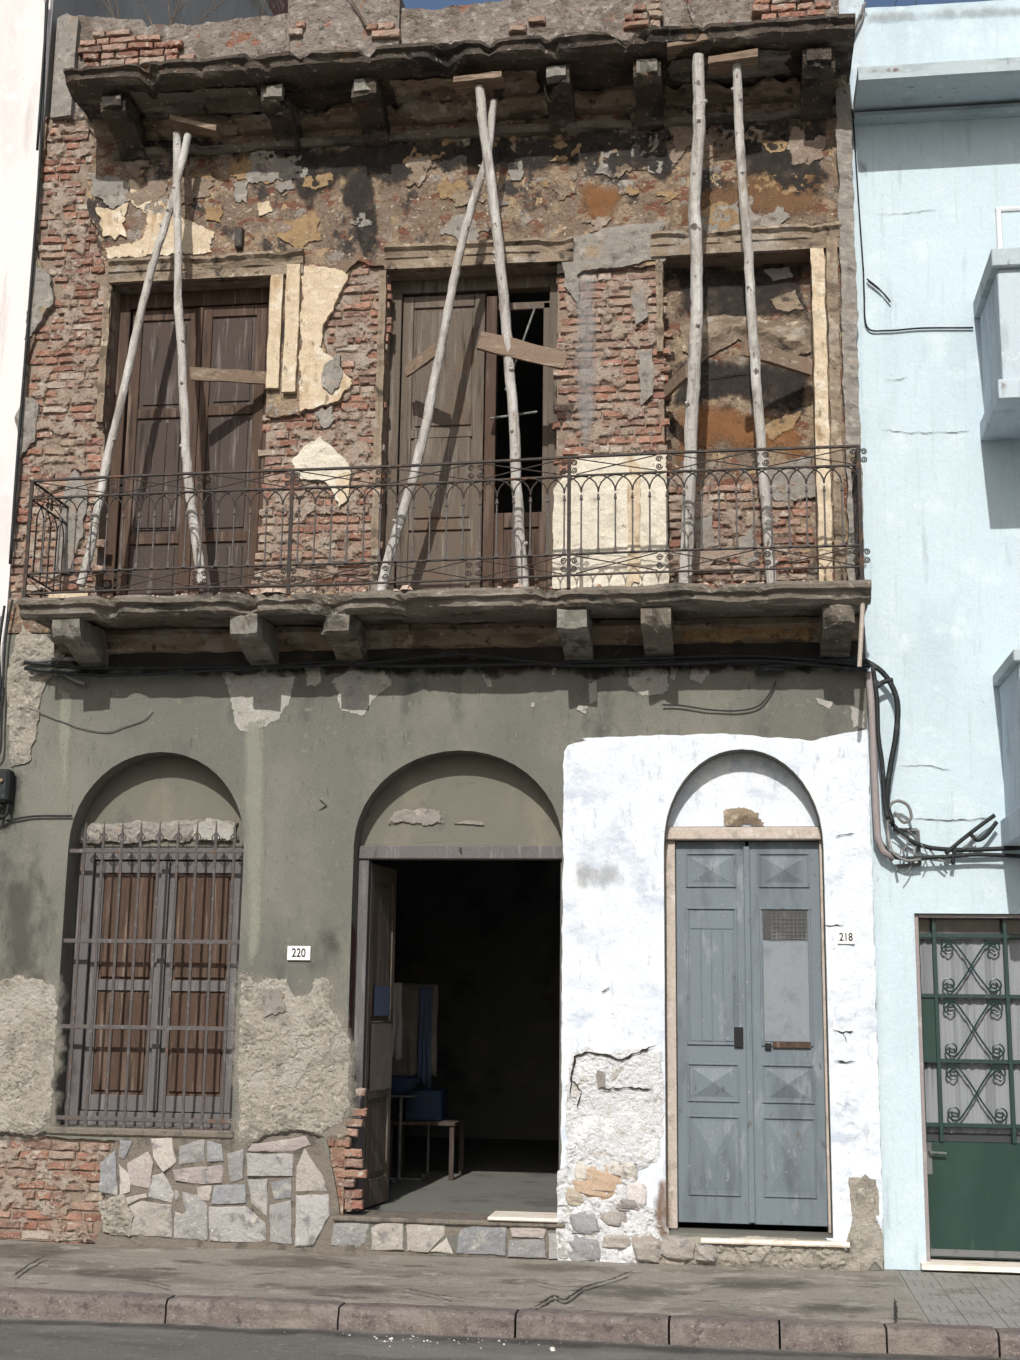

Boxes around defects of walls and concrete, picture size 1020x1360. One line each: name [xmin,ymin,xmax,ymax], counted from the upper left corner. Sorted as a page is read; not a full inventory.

flaking render [77,29,197,67]
damp [285,150,322,208]
peeling [595,110,827,232]
flaking render [10,112,333,600]
flaking render [249,263,393,597]
flaking render [552,215,815,591]
spalling [4,625,65,767]
peeling [221,667,392,732]
spalling [0,973,134,1244]
spalling [232,923,368,1215]
spalling [564,1046,665,1170]
spalling [846,1174,884,1271]